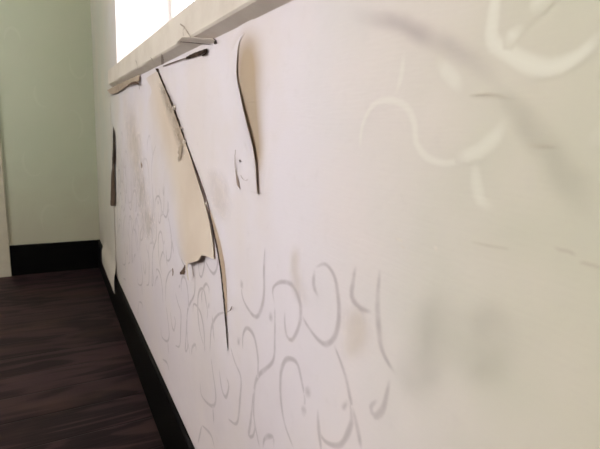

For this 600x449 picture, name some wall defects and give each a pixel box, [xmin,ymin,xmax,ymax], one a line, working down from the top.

flaking render [230,19,271,193]